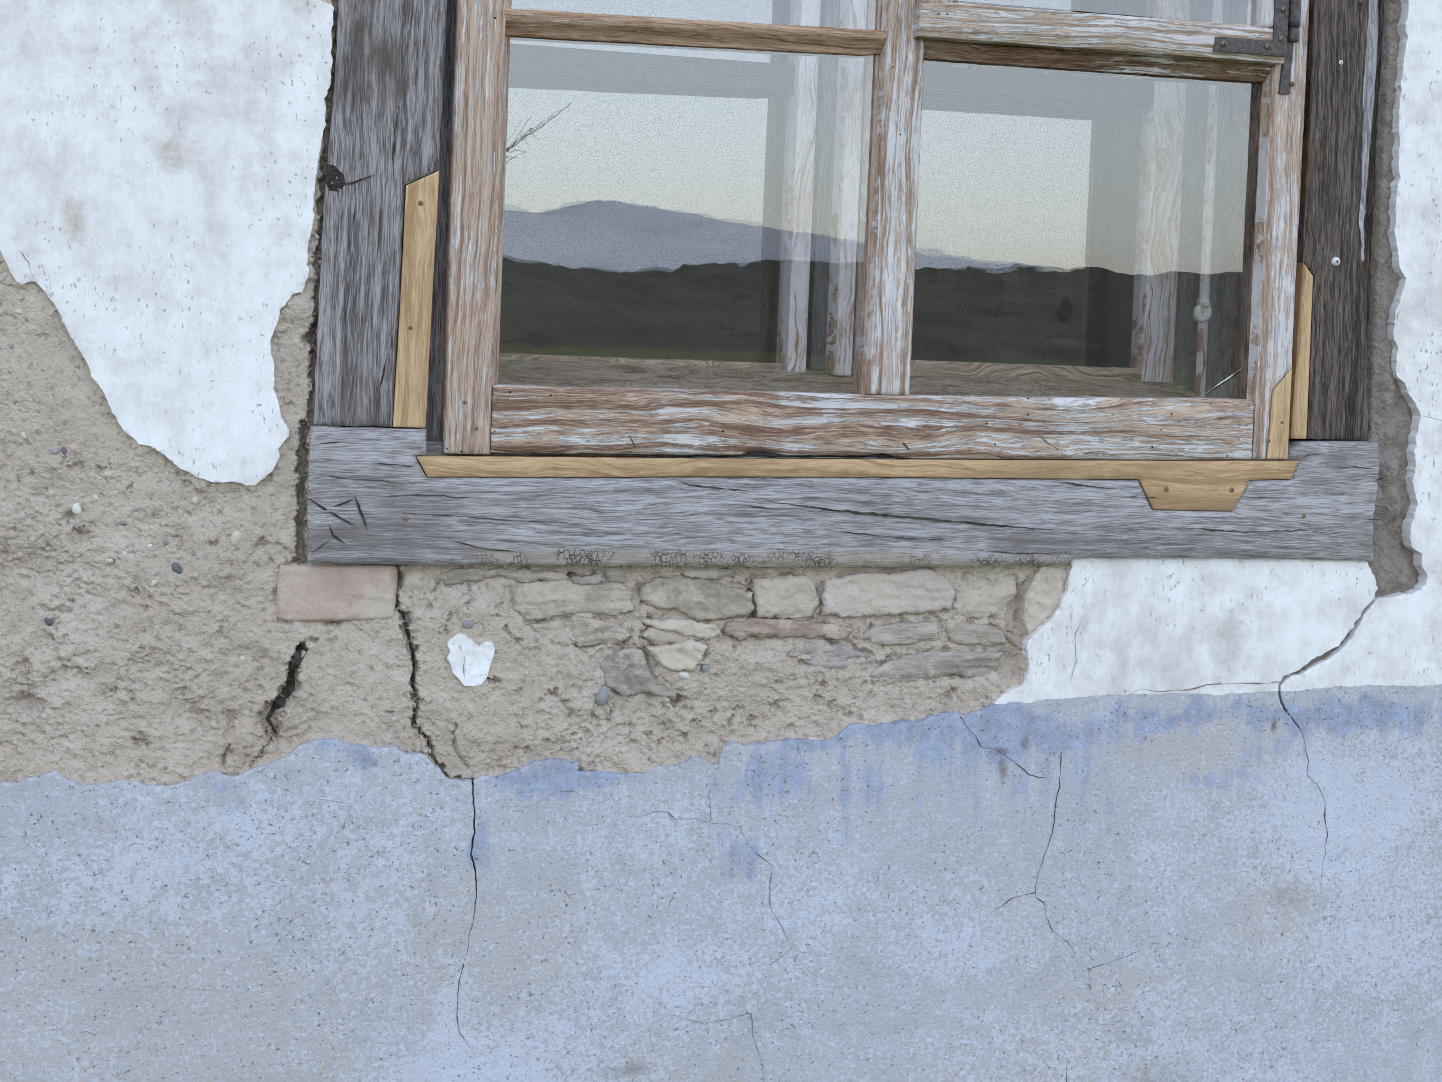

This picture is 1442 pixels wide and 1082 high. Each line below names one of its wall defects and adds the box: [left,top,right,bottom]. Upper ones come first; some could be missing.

flaking render [0,0,1069,785]
flaking render [1366,0,1419,596]
crack [266,644,307,732]
crack [395,604,436,761]
crack [1126,594,1377,697]
crack [457,778,477,1046]
crack [511,778,835,969]
crack [960,717,1135,989]
crack [1305,751,1328,890]
crack [669,1013,764,1082]